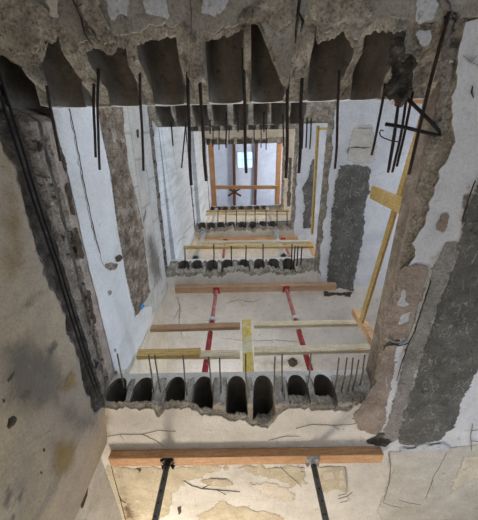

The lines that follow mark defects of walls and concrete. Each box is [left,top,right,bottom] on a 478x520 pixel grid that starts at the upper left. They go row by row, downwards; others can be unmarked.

spalling [383,36,418,108]
crack [68,108,106,268]
flaking render [302,159,314,229]
flaking render [323,125,377,297]
crack [389,281,431,381]
flaking render [353,185,478,520]
crack [107,430,176,447]
crack [268,423,356,441]
peeling [106,465,233,520]
crack [184,481,240,495]
peeling [318,466,347,494]
crack [383,452,447,508]